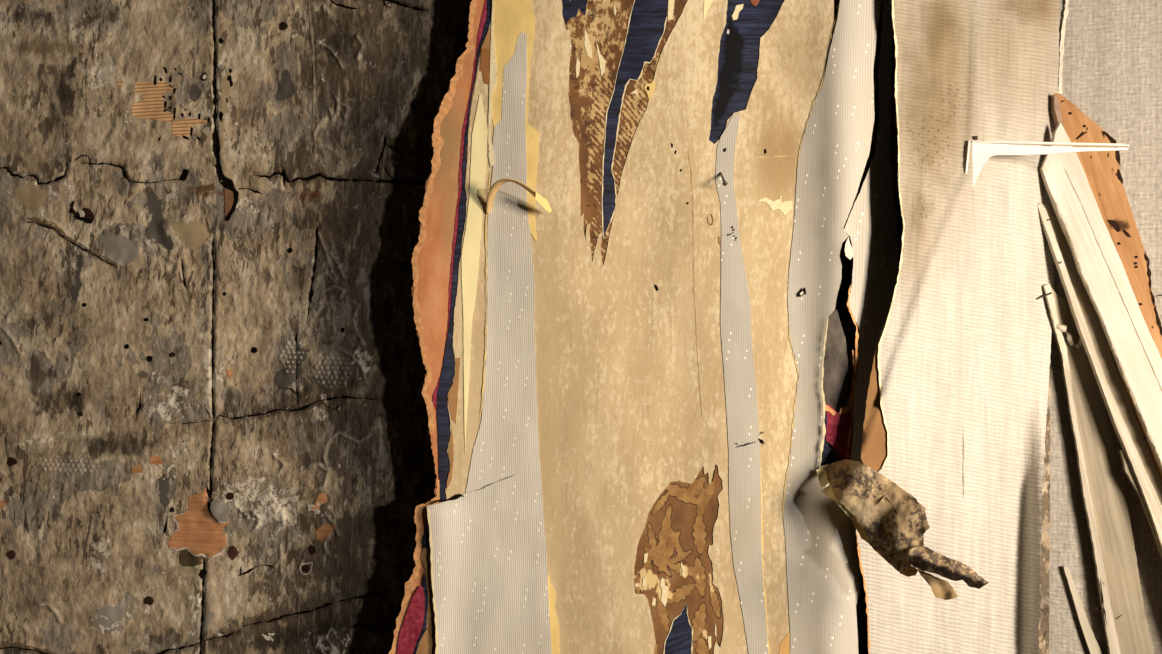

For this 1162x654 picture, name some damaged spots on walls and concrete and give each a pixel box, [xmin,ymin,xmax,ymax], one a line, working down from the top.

crack [0,155,178,185]
spalling [86,67,231,172]
crack [212,0,426,195]
peeling [486,179,552,214]
peeling [576,27,606,78]
crack [170,225,376,500]
spalling [1053,197,1162,465]
spalling [131,455,284,567]
crack [156,557,385,654]
peeling [635,553,668,606]
peeling [816,459,989,600]